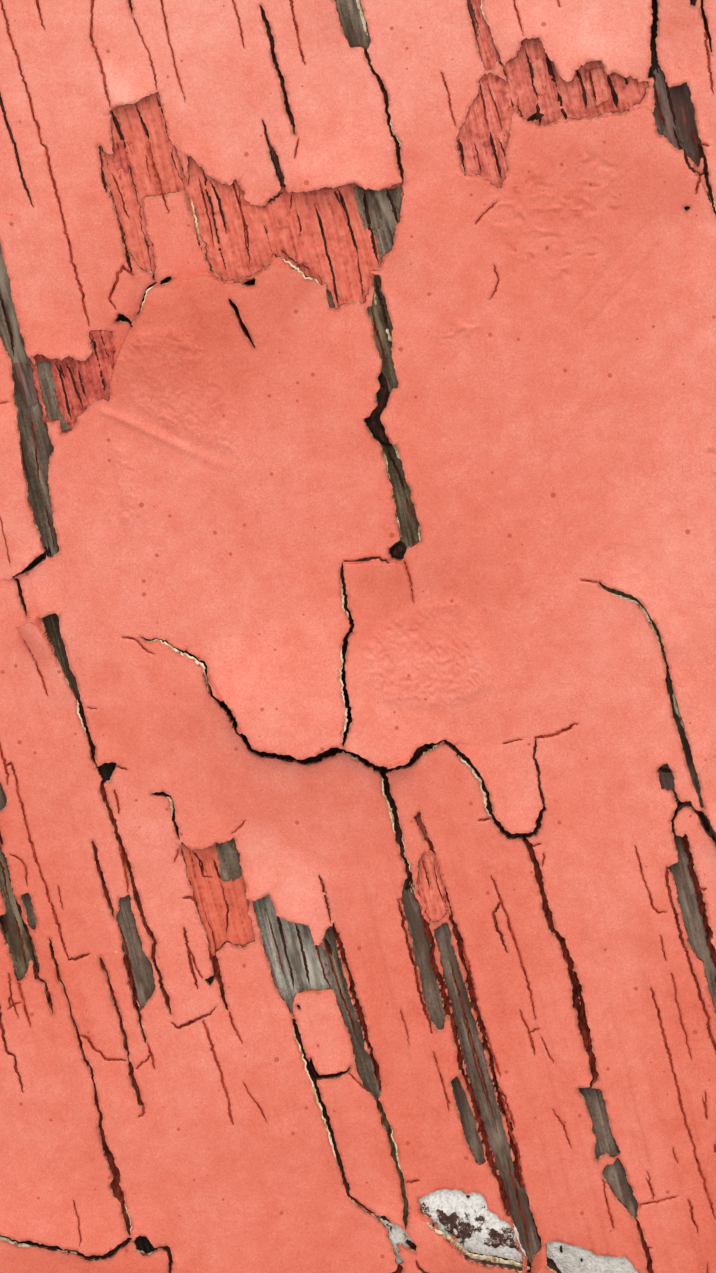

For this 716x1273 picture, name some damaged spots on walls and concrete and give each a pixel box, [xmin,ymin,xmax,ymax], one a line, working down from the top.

peeling [334,0,370,49]
spalling [457,0,708,187]
peeling [0,243,132,709]
spalling [99,61,421,559]
crack [580,579,668,668]
crack [0,517,267,1259]
peeling [182,823,382,1097]
crack [122,556,598,1227]
peeling [401,812,638,1273]
peeling [658,668,716,1012]
crack [160,1246,173,1273]
crack [392,1261,429,1273]